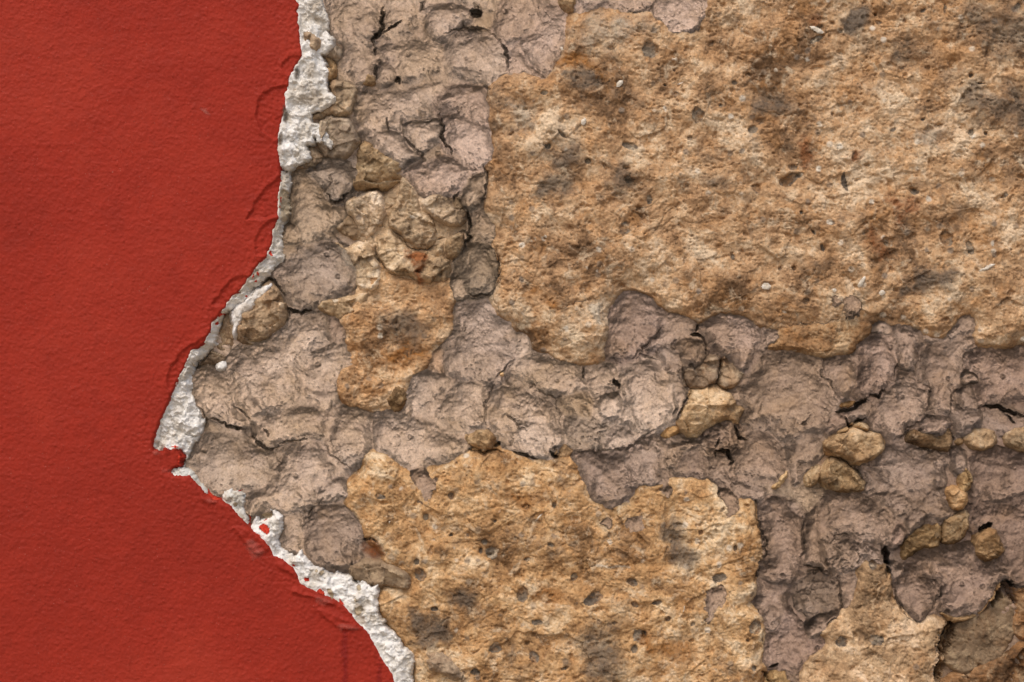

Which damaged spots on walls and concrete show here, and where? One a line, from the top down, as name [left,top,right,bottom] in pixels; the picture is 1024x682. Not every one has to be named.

spalling [642,40,658,58]
spalling [692,106,705,123]
spalling [779,165,803,187]
spalling [619,221,630,236]
spalling [940,230,953,246]
flaking render [154,0,415,682]
crack [820,363,966,454]
spalling [479,539,499,560]
spalling [413,558,427,581]
spalling [517,585,528,602]
spalling [583,592,603,606]
spalling [631,629,646,653]